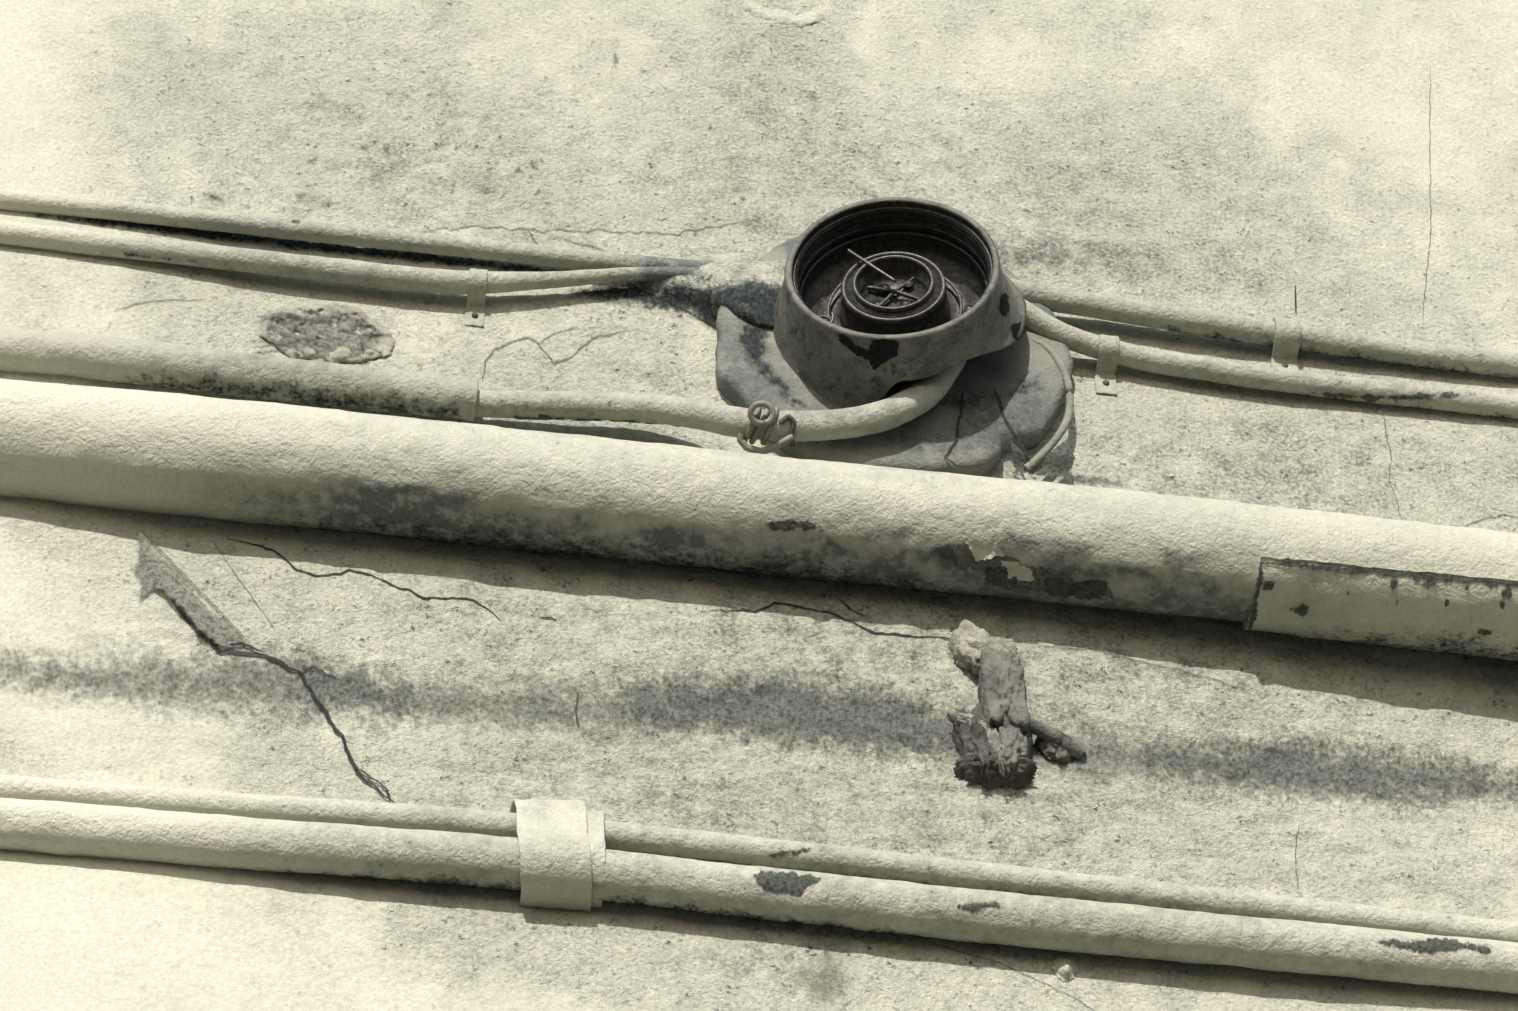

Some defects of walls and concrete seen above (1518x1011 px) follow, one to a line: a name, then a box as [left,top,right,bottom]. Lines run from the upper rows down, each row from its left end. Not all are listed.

flaking render [253,303,395,364]
flaking render [135,531,250,648]
crack [712,598,949,639]
crack [173,538,501,803]
damp [0,653,960,756]
damp [1030,735,1518,807]